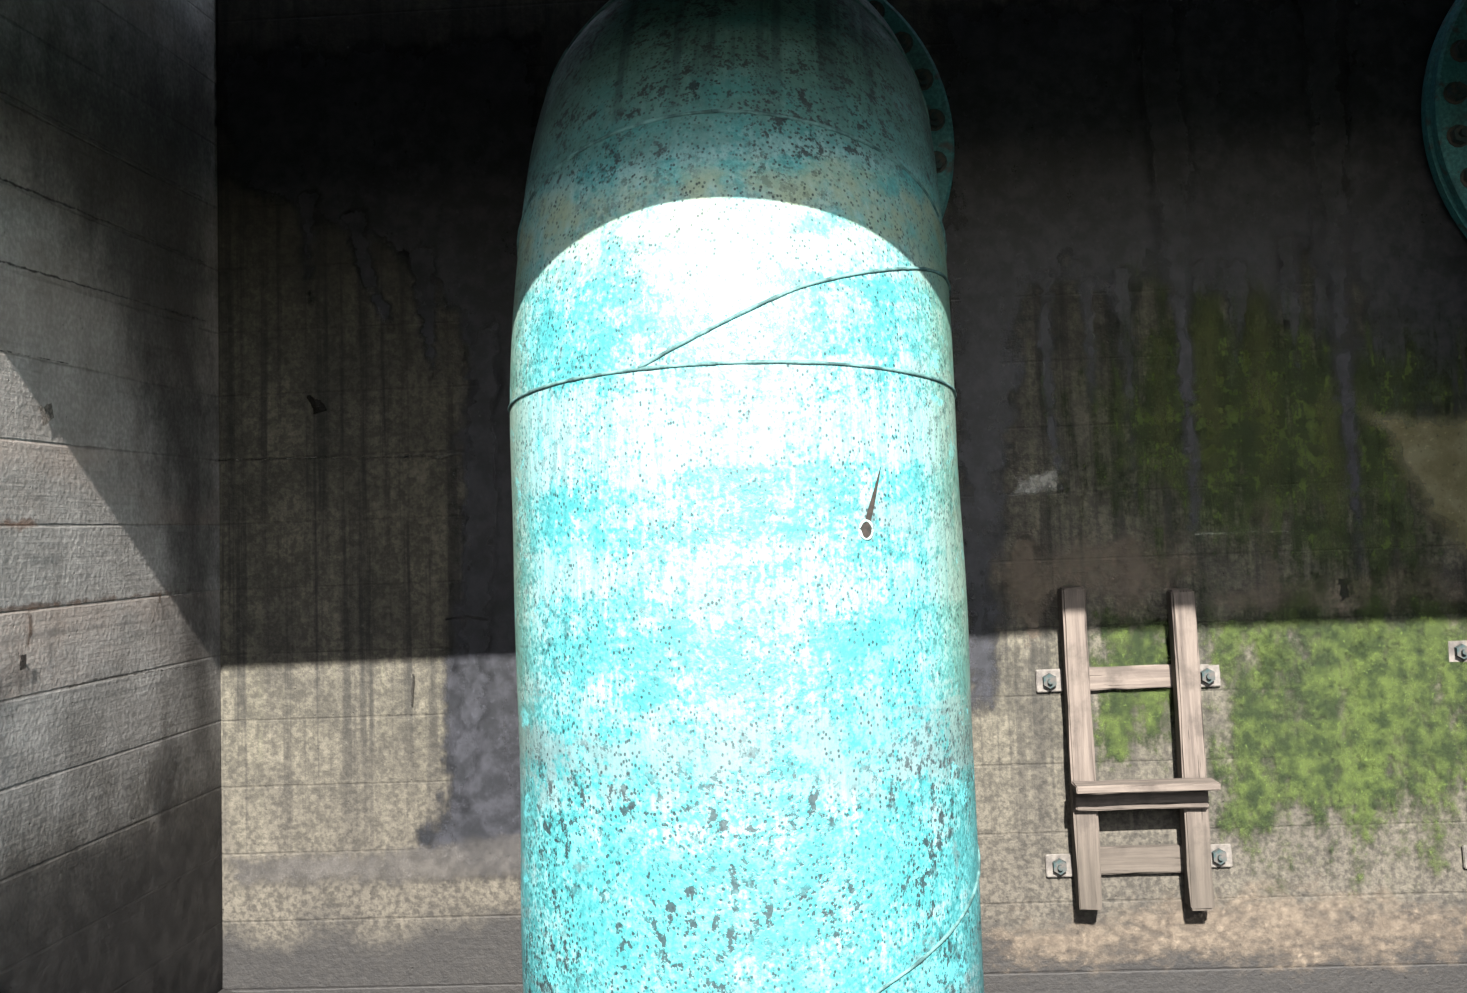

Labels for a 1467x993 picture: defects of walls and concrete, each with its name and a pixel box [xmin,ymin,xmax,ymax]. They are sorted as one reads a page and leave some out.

leakage [0,28,542,993]
leakage [930,0,1467,710]